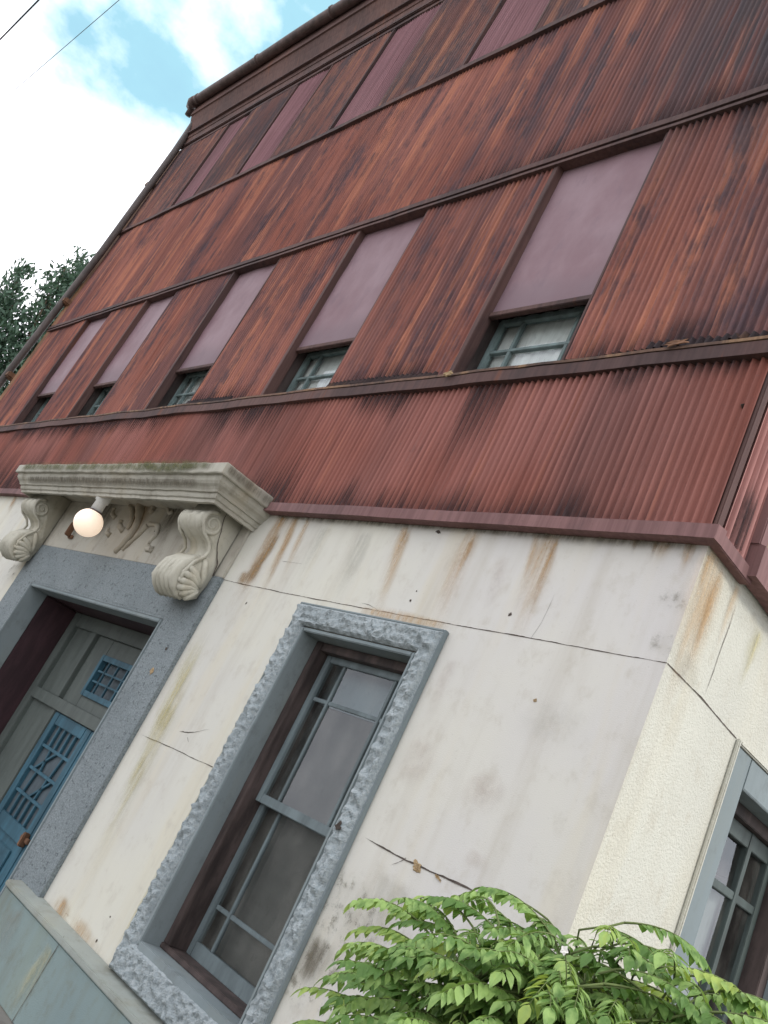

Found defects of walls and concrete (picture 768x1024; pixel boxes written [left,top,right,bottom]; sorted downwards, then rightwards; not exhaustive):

corrosion [240,517,296,582]
crack [143,729,213,767]
crack [368,839,472,891]